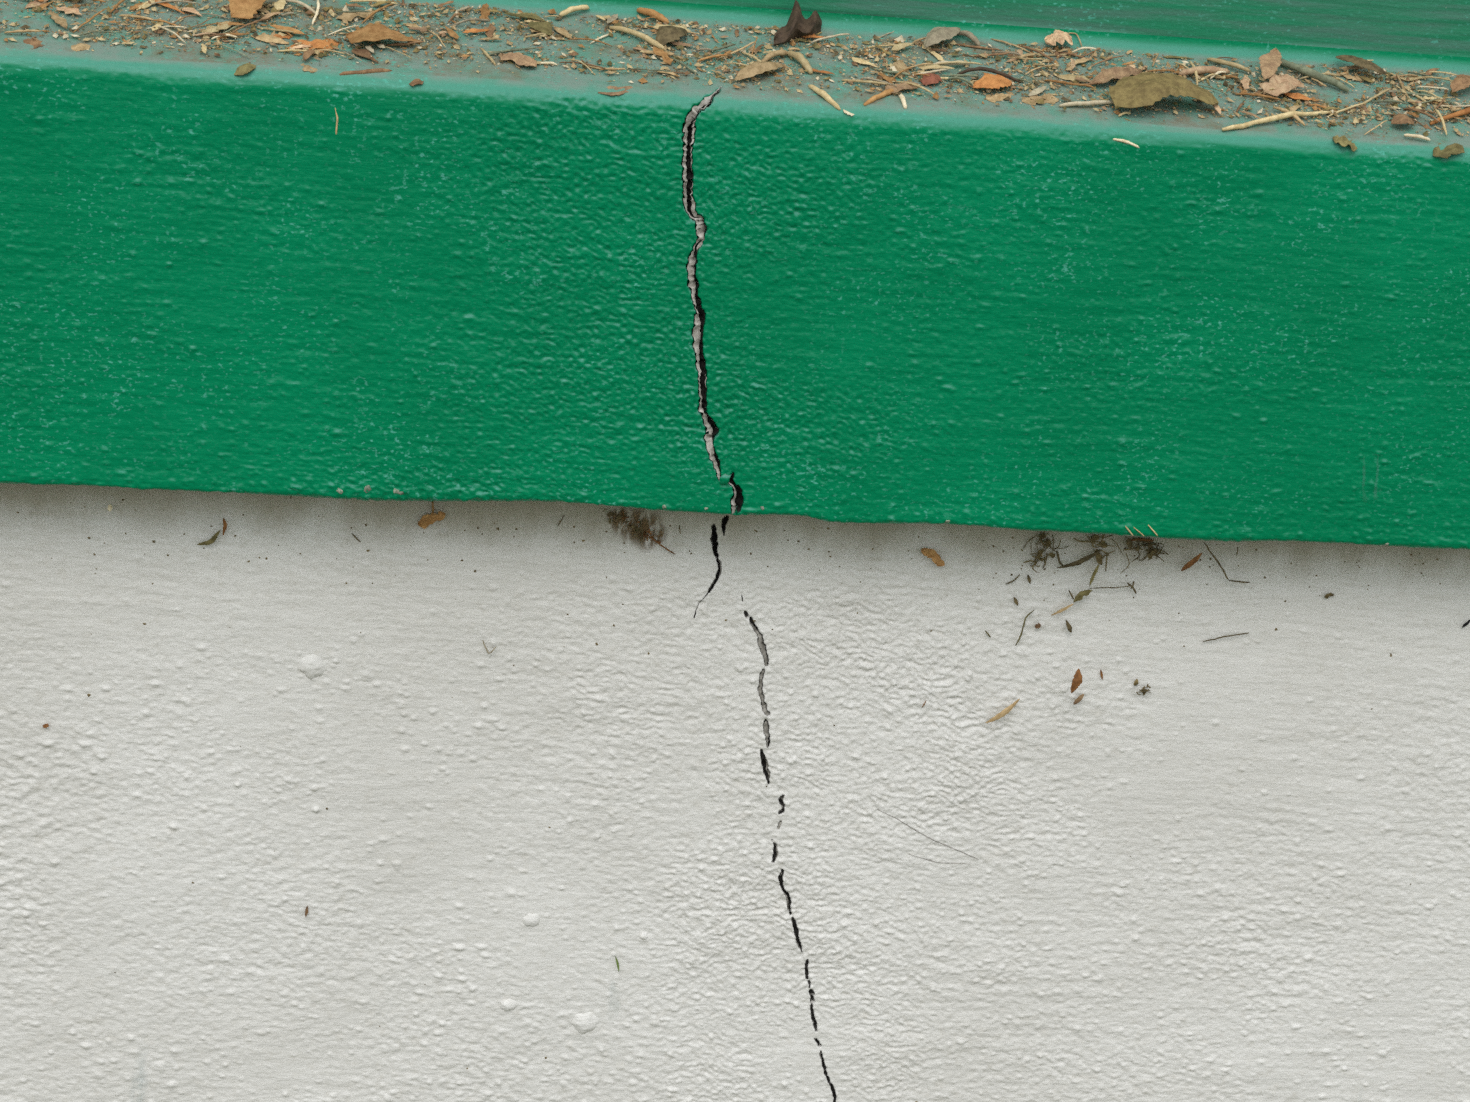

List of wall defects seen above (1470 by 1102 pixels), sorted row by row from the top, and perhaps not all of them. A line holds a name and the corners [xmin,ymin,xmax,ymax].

crack [682,86,836,1102]